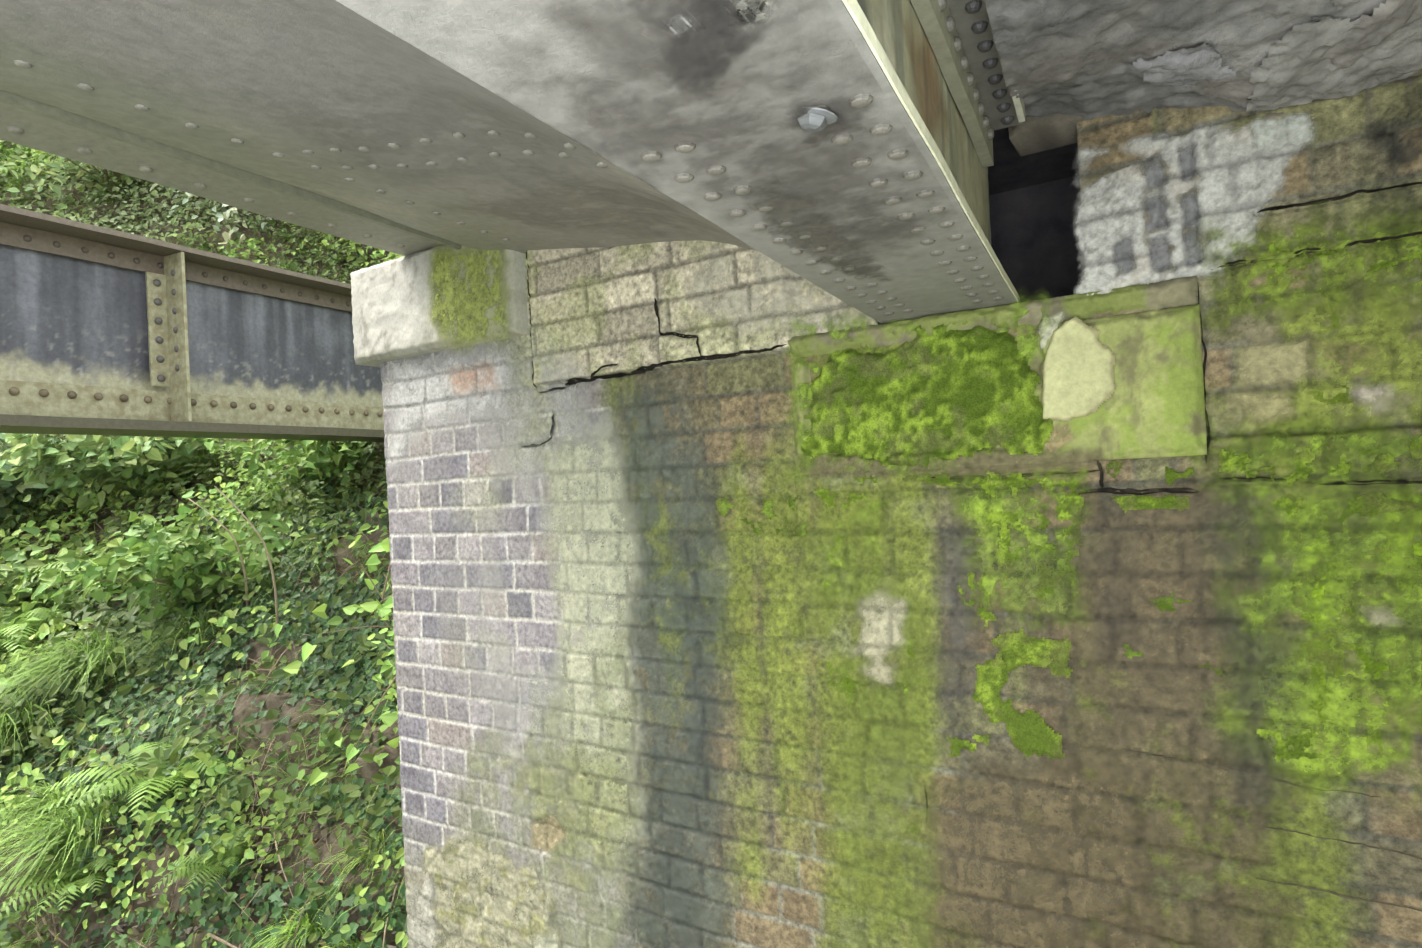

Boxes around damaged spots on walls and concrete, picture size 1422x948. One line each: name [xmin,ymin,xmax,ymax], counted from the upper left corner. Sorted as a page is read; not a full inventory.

peeling [1075,0,1422,296]
damp [1373,103,1418,164]
crack [523,252,787,447]
spalling [1039,314,1117,453]
crack [931,231,1422,495]
damp [1239,339,1314,420]
damp [1355,387,1384,402]
damp [797,450,1099,476]
damp [856,597,906,683]
damp [929,485,1284,948]
spalling [531,816,564,852]
spalling [410,840,559,948]